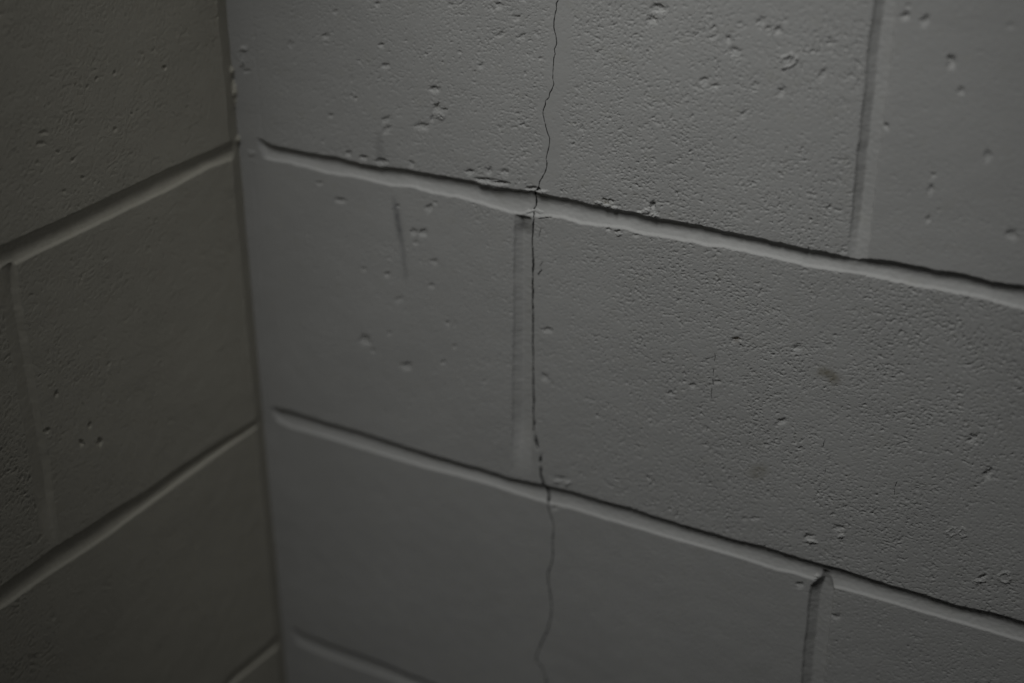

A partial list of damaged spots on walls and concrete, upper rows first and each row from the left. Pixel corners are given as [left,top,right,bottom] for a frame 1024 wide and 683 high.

crack [532,0,558,683]